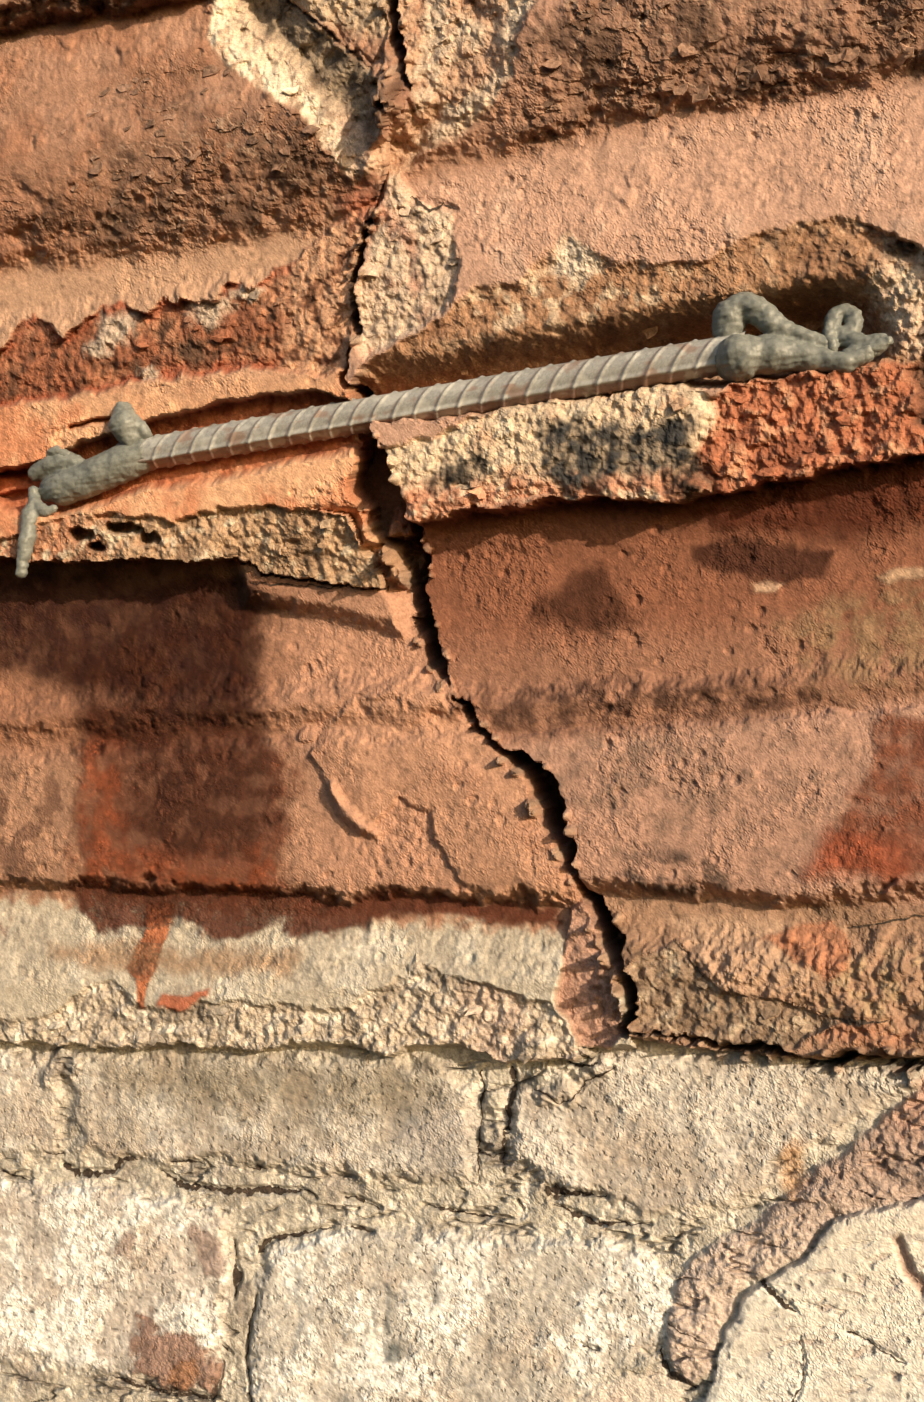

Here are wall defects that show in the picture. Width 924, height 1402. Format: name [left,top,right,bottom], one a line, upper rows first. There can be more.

spalling [0,0,924,524]
spalling [0,505,389,592]
damp [0,567,259,743]
crack [338,196,924,1227]
corrosion [76,705,290,1012]
spalling [0,956,599,1065]
crack [660,1323,705,1389]
crack [761,1279,805,1402]
crack [848,1331,905,1364]